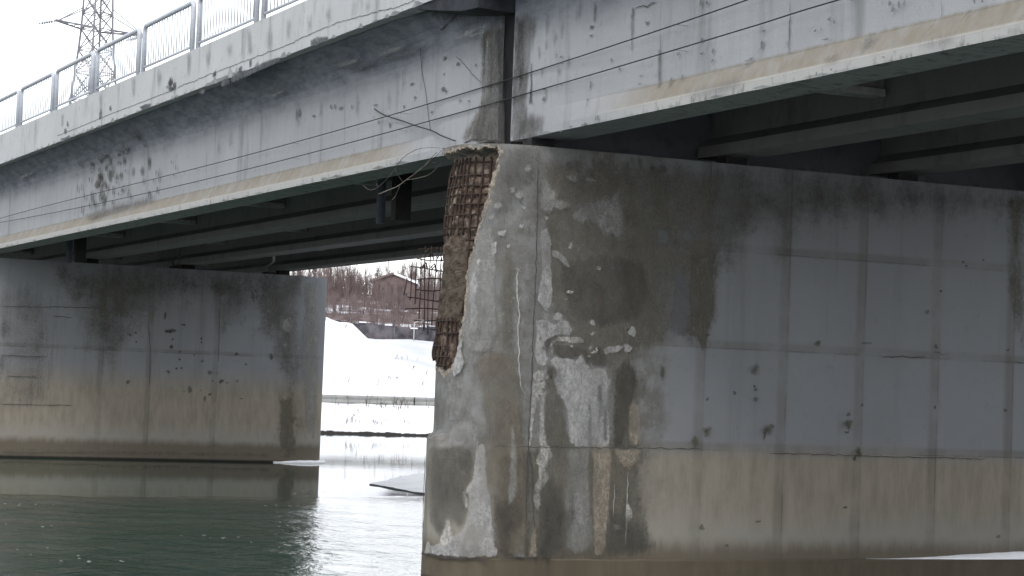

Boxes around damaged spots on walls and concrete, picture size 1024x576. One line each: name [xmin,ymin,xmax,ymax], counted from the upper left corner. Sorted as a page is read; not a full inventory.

leakage [465,16,540,143]
leakage [262,276,318,447]
spalling [403,144,508,378]
peeling [534,312,636,550]
crack [494,171,699,526]
leakage [425,155,885,558]
crack [770,452,987,460]